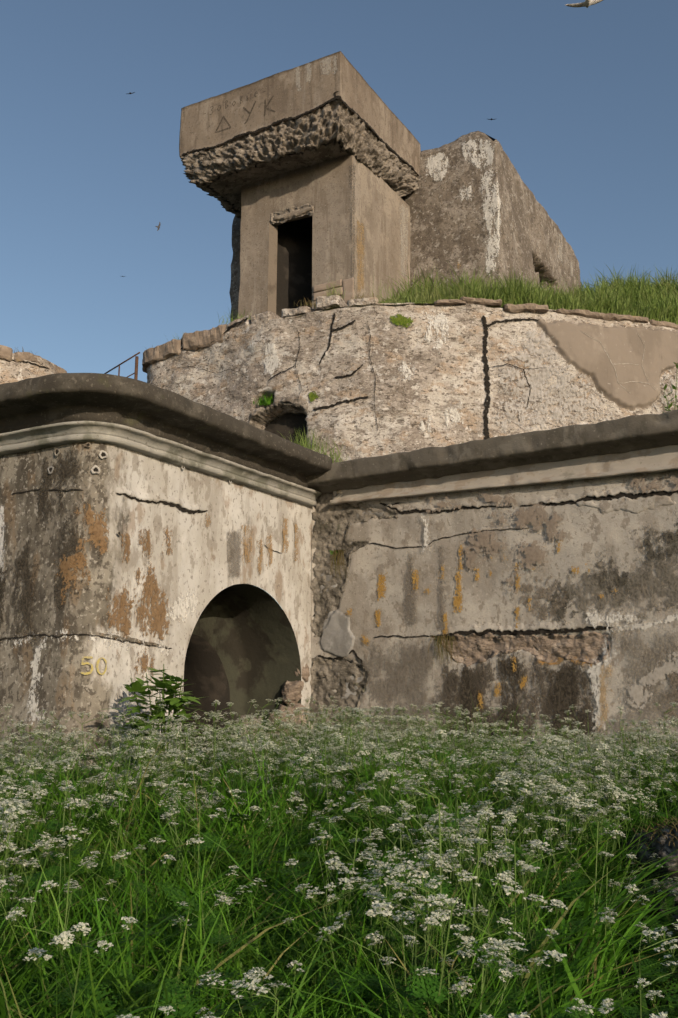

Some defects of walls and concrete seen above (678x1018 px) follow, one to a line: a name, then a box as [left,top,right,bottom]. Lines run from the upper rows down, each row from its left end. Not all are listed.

spalling [180,99,419,219]
efflorescence [459,138,502,276]
crack [247,313,378,431]
crack [482,316,539,440]
peeling [536,319,678,411]
crack [369,484,678,549]
damp [0,506,169,724]
spalling [232,493,398,758]
corrosion [374,573,387,627]
crack [312,618,614,681]
corrosion [411,545,521,636]
damp [358,513,678,749]